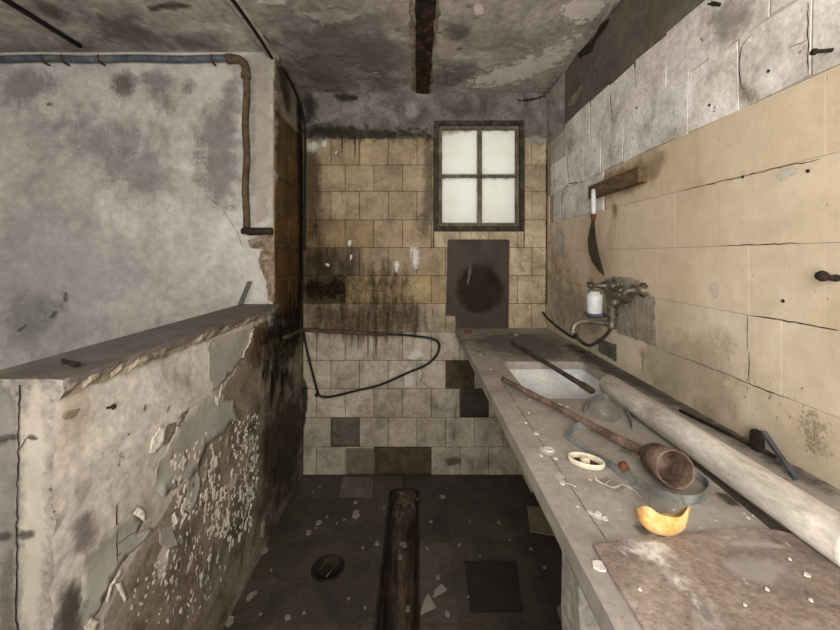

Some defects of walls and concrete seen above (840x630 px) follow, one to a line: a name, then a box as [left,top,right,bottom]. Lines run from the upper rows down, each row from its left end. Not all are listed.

peeling [466,0,620,102]
crack [686,159,818,190]
flaking render [248,234,276,302]
peeling [605,276,656,346]
crack [664,315,836,399]
flaking render [62,408,80,420]
peeling [78,316,303,630]
leakage [261,371,304,509]
peeling [331,418,432,475]